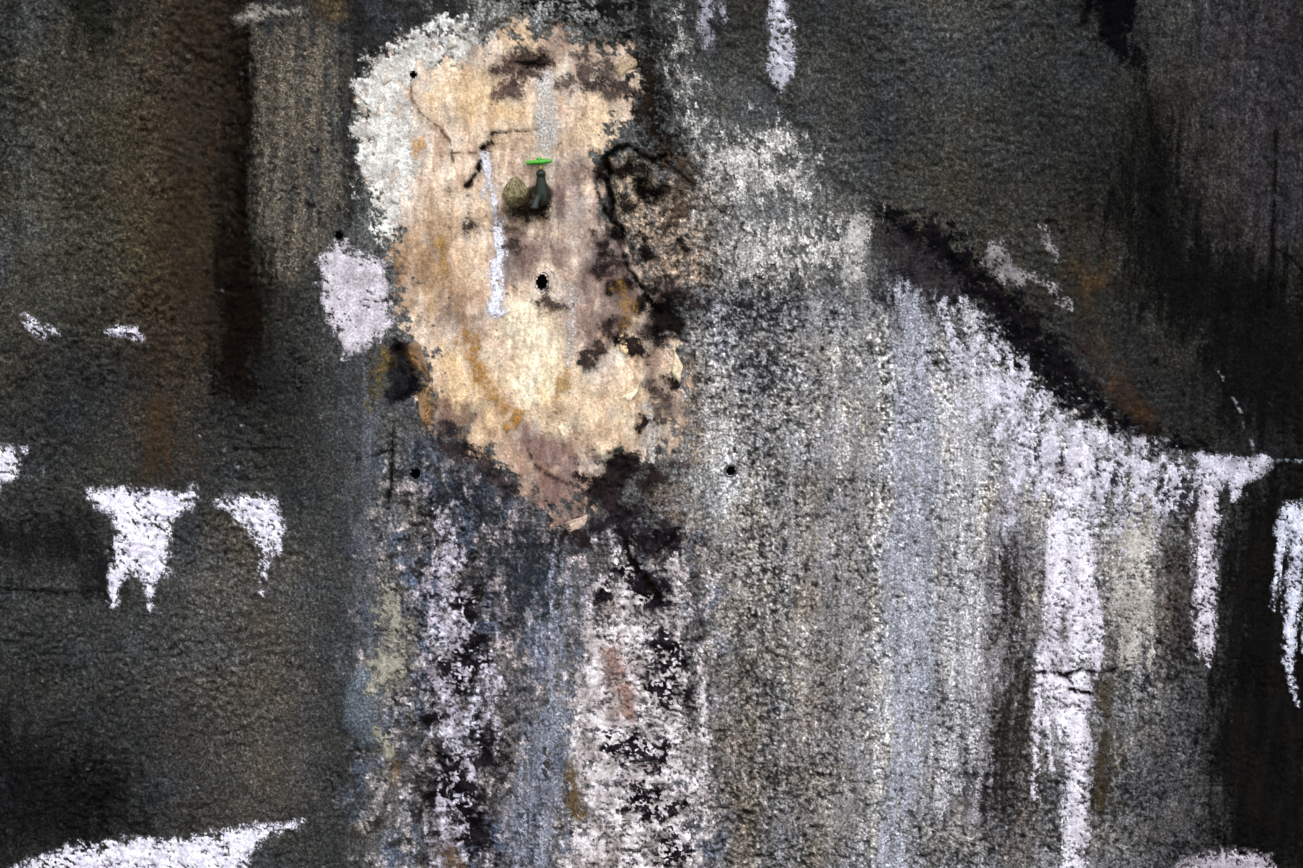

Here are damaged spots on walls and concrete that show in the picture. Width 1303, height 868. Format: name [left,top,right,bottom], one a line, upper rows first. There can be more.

damp [57,0,116,63]
crack [410,79,537,229]
damp [23,314,60,340]
damp [104,326,143,341]
spalling [348,11,695,532]
damp [0,445,28,487]
damp [204,0,718,868]
damp [488,0,1303,868]
damp [0,485,199,612]